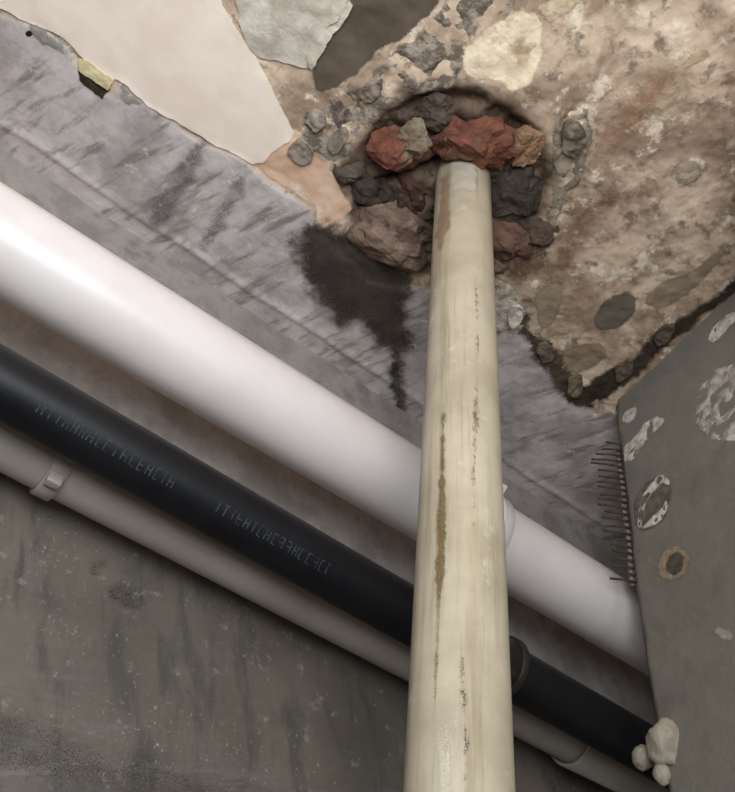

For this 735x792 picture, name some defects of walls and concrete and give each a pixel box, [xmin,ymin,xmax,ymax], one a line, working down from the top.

peeling [0,0,735,413]
leakage [284,219,421,411]
spalling [694,364,735,442]